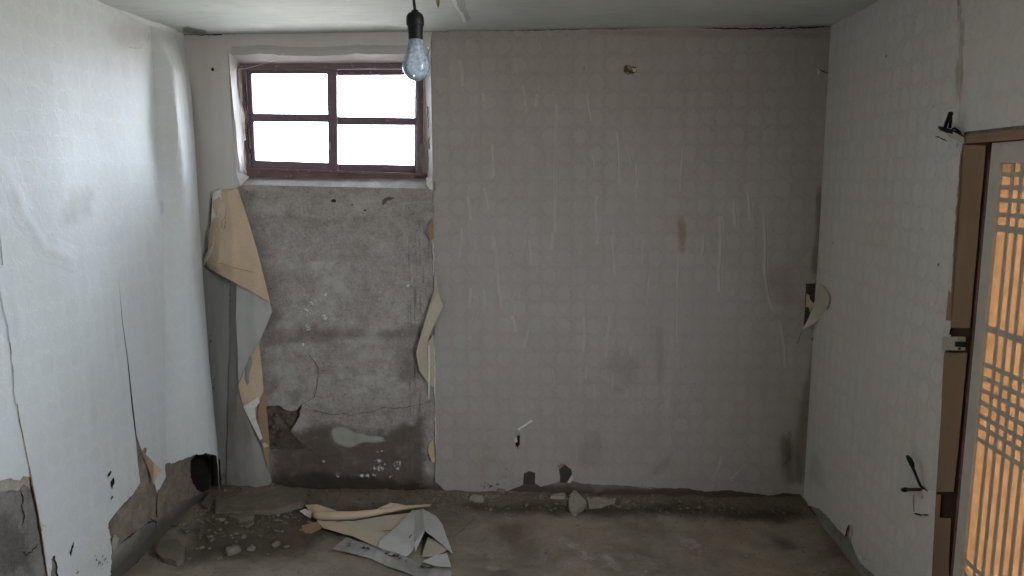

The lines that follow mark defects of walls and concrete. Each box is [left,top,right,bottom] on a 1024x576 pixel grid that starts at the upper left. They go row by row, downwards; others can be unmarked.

spalling [804,284,816,325]
spalling [266,405,310,451]
damp [275,420,425,491]
spalling [0,476,30,527]
spalling [109,448,311,561]